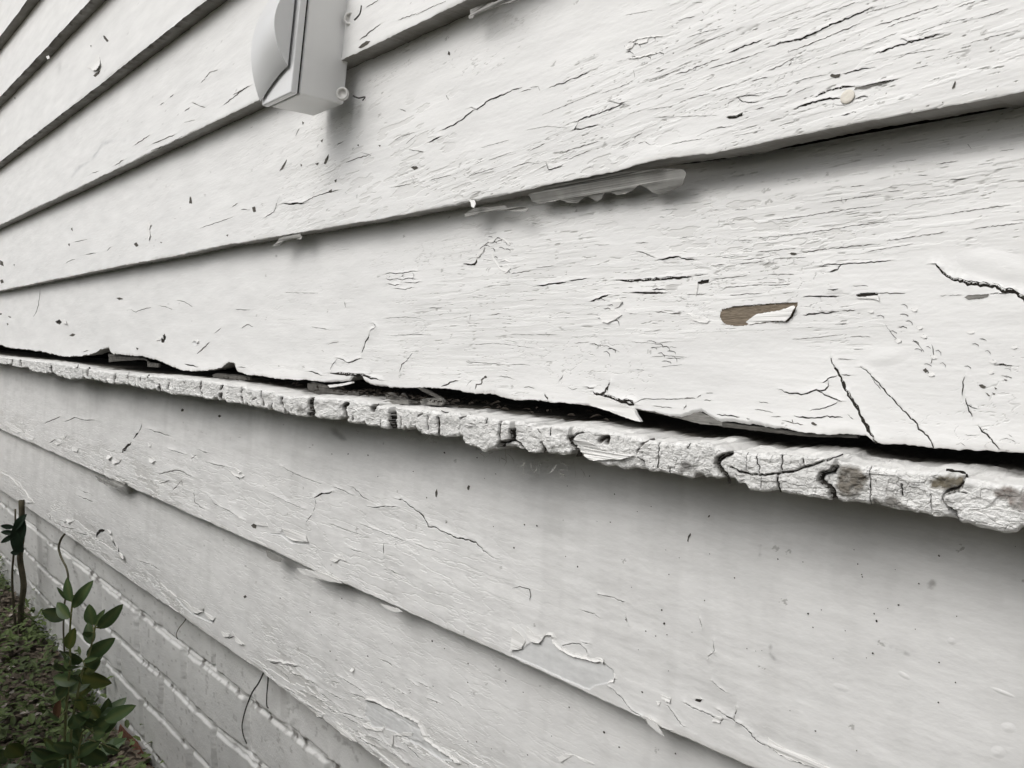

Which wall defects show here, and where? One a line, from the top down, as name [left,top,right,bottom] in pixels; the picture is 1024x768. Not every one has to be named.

crack [395,1,1013,187]
crack [115,146,1024,516]
peeling [720,302,798,326]
peeling [967,330,1011,396]
peeling [95,475,127,488]
peeling [573,438,632,461]
crack [271,469,492,573]
peeling [510,626,618,690]